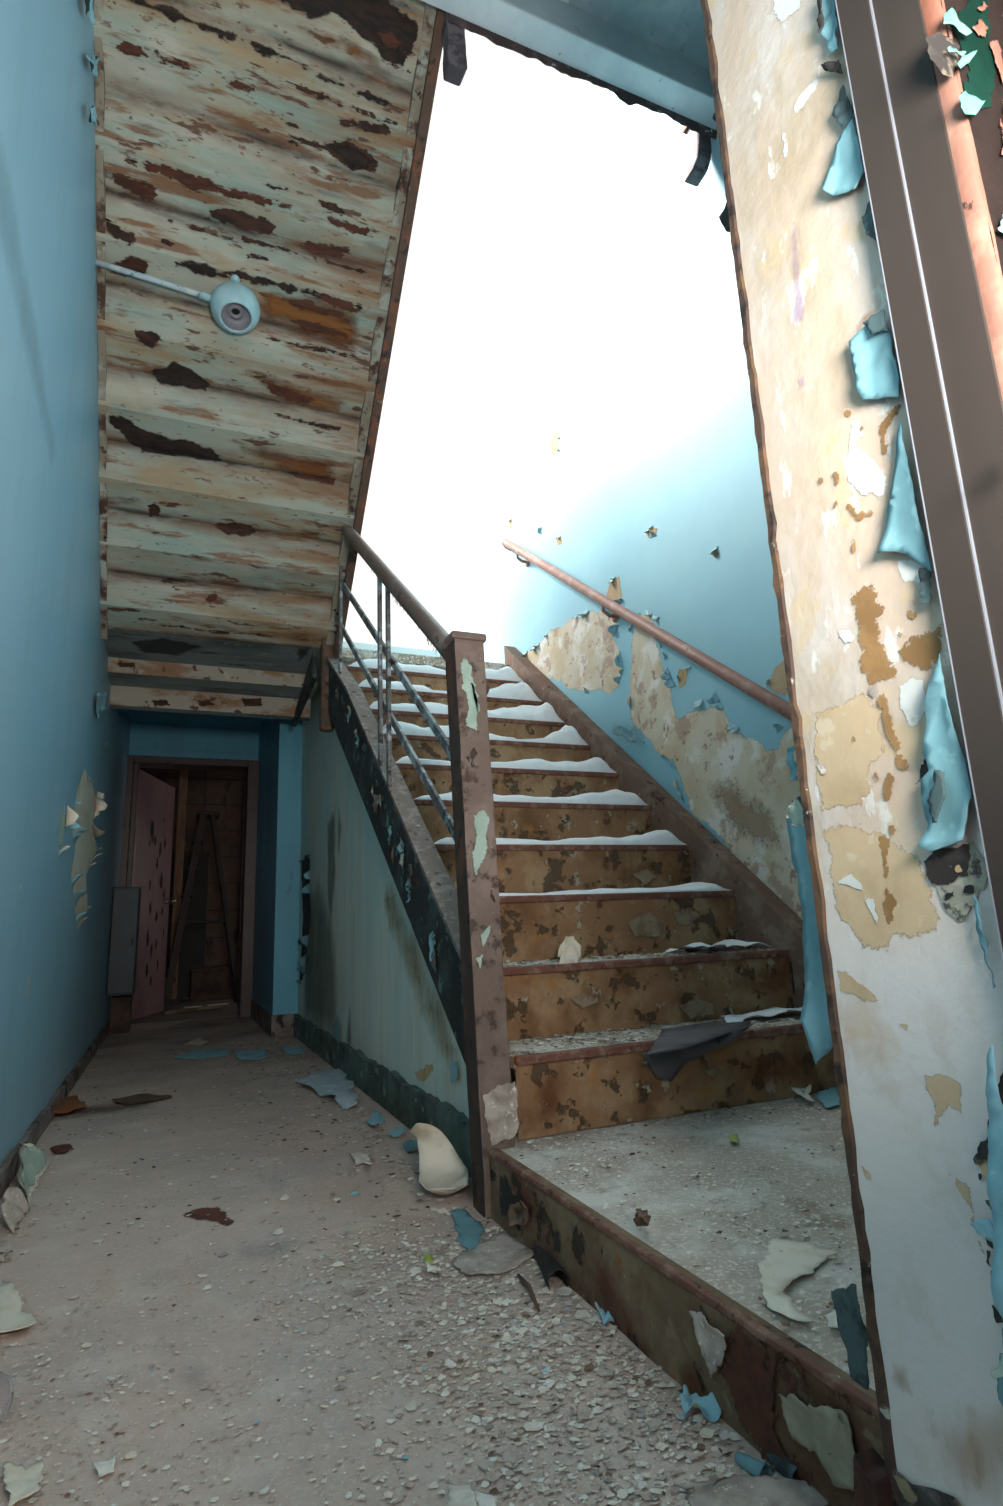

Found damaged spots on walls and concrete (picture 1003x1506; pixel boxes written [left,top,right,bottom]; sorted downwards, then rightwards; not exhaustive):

peeling [816,0,864,196]
peeling [926,0,1003,155]
peeling [861,200,877,241]
peeling [849,309,900,400]
peeling [877,422,932,604]
peeling [58,769,108,933]
peeling [521,576,996,1065]
peeling [949,1043,1003,1407]
rust [682,1372,698,1395]
rust [720,1319,852,1487]
peeling [778,1393,856,1492]
flaking render [893,1470,962,1506]